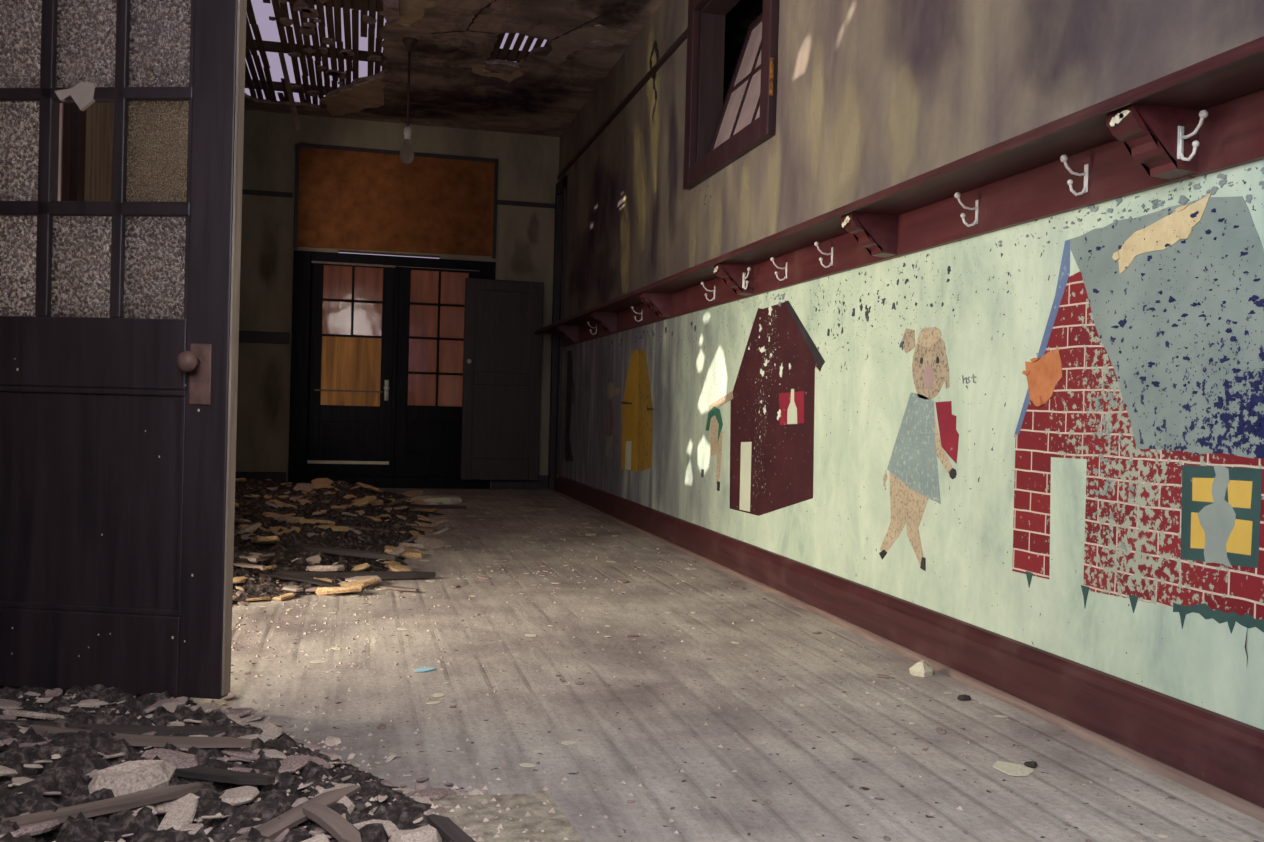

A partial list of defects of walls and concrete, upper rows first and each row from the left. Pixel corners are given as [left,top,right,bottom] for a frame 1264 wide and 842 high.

leakage [811,68,823,159]
flaking render [998,167,1264,573]